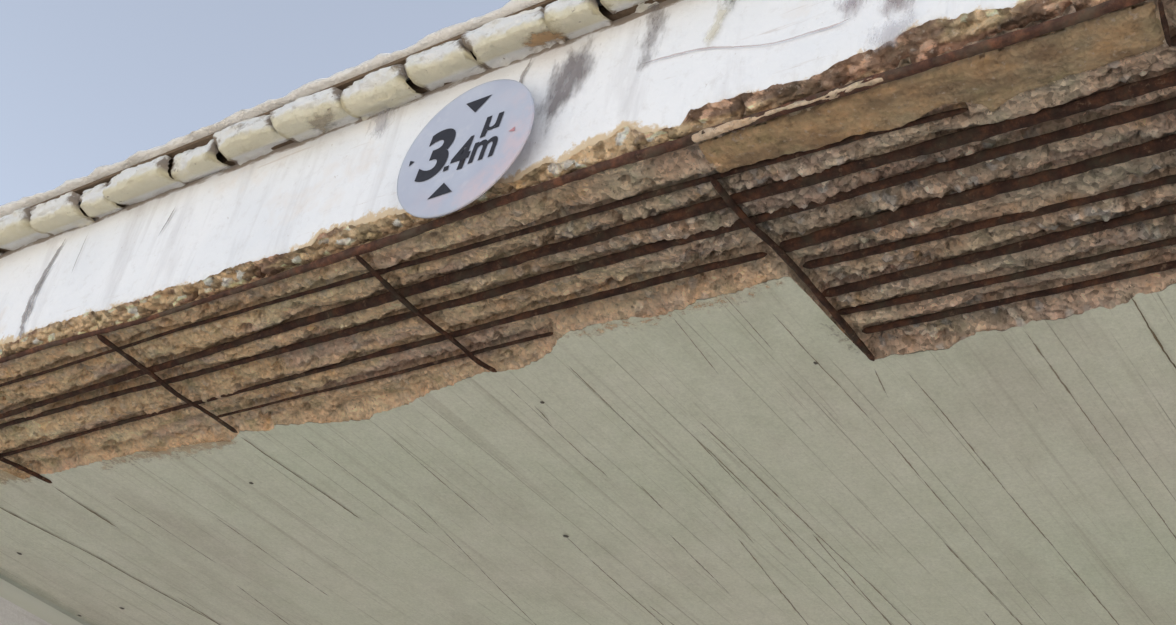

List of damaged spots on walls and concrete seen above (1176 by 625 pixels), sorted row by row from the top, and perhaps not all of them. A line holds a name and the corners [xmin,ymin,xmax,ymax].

rust [524,31,563,47]
rust [309,109,333,133]
spalling [0,0,1176,483]